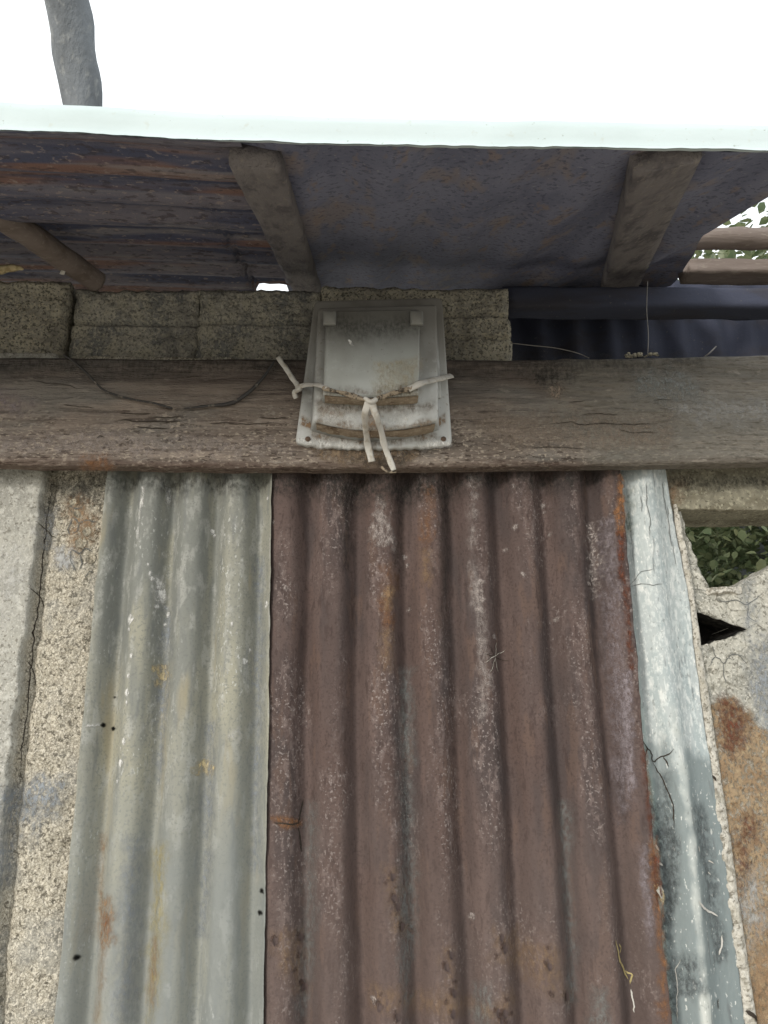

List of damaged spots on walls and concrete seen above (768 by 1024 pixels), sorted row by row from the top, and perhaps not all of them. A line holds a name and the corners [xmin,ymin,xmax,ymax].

crack [17,485,95,785]
corrosion [614,477,633,670]
hole [697,613,747,645]
crack [643,741,674,821]
corrosion [711,697,768,1024]